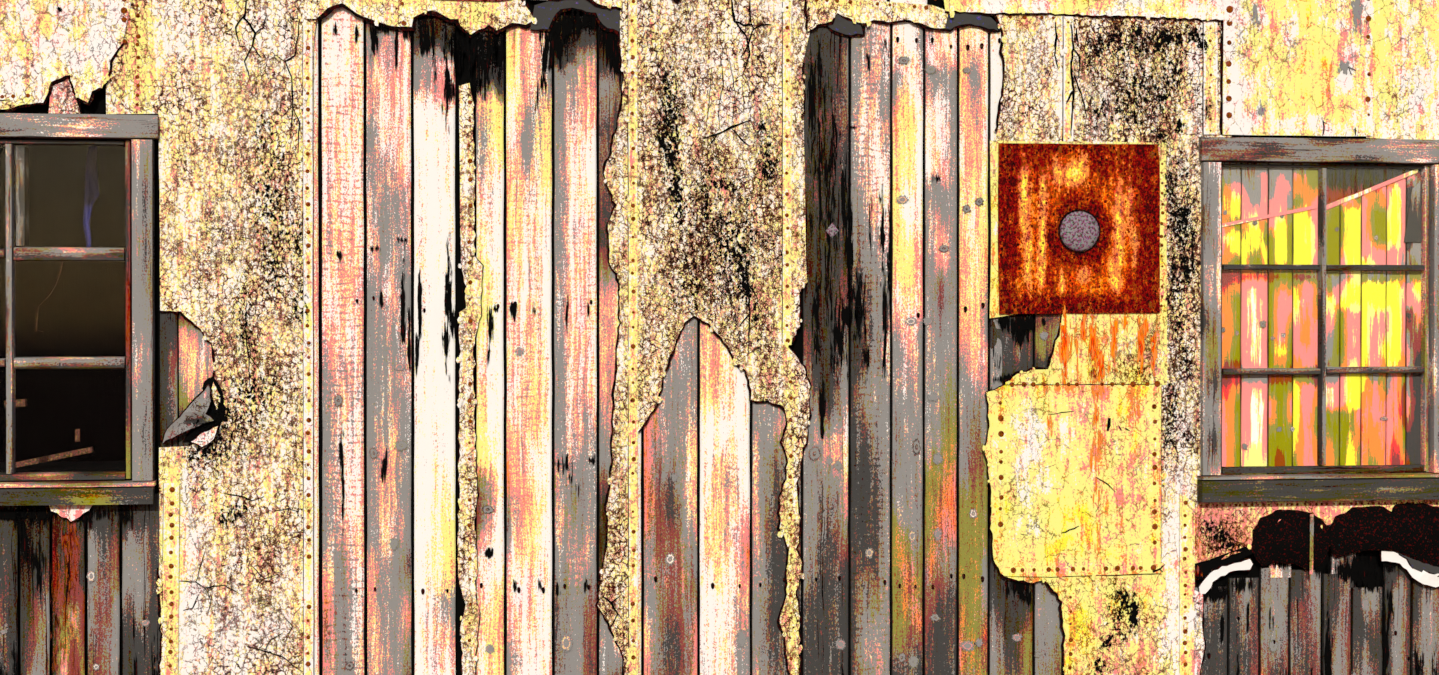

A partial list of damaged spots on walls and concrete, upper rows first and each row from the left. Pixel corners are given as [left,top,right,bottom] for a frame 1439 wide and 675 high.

peeling [156,536,166,675]
peeling [300,0,812,675]
water stain [653,53,781,363]
peeling [982,313,1165,675]
rust [1057,306,1158,530]
water stain [1089,584,1143,675]
water stain [1083,22,1212,454]
peeling [1198,503,1439,675]